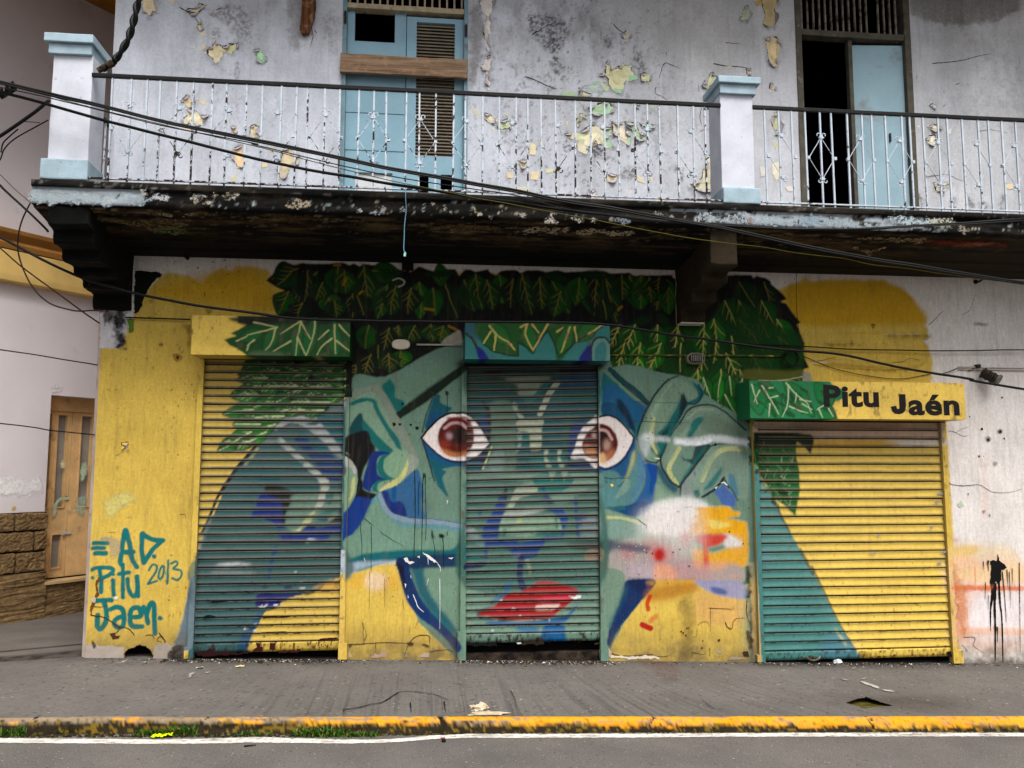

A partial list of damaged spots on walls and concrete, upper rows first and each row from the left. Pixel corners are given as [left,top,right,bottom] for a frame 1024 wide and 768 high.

peeling [186,3,239,63]
peeling [479,0,495,90]
peeling [740,0,781,68]
peeling [702,66,752,89]
peeling [180,95,209,130]
peeling [562,60,656,154]
peeling [771,112,785,149]
peeling [28,124,259,235]
peeling [507,138,555,192]
peeling [691,155,711,192]
peeling [276,198,311,221]
peeling [422,203,501,233]